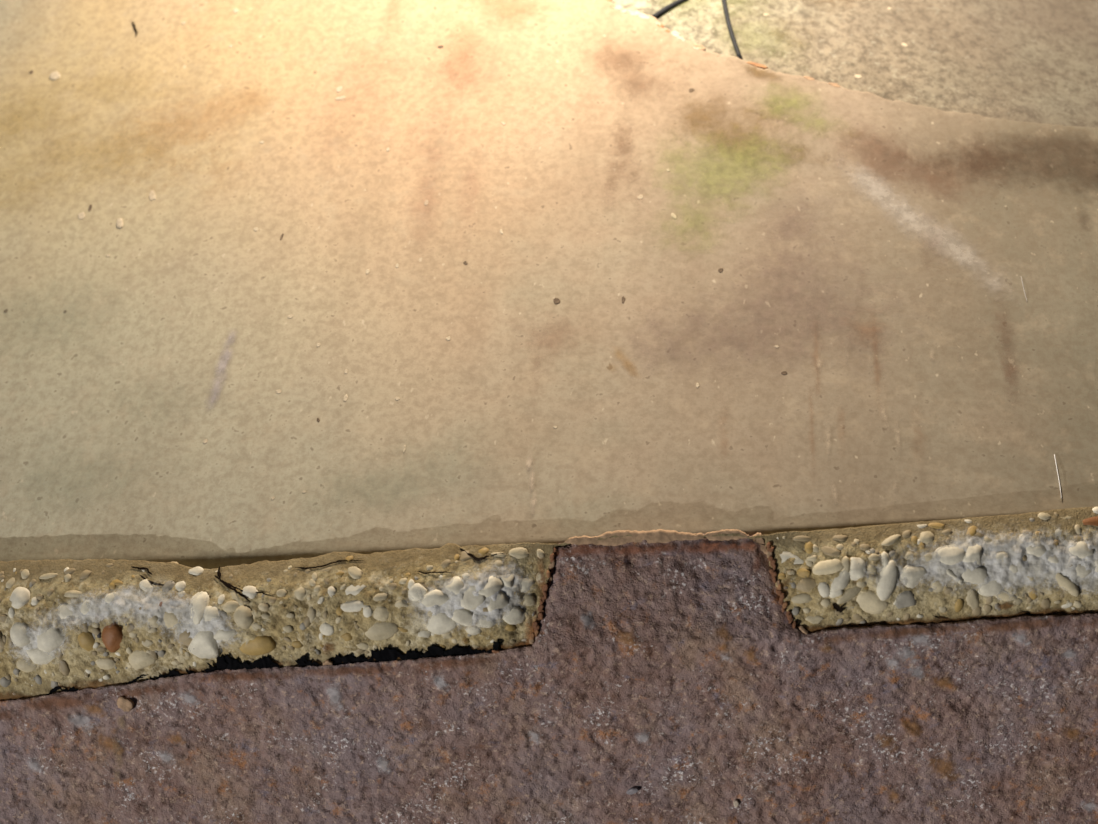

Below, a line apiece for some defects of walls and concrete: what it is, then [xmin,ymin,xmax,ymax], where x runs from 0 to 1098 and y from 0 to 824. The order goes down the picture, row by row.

spalling [607,0,706,51]
rust [422,529,850,668]
rust [867,603,1078,637]
rust [0,681,111,712]